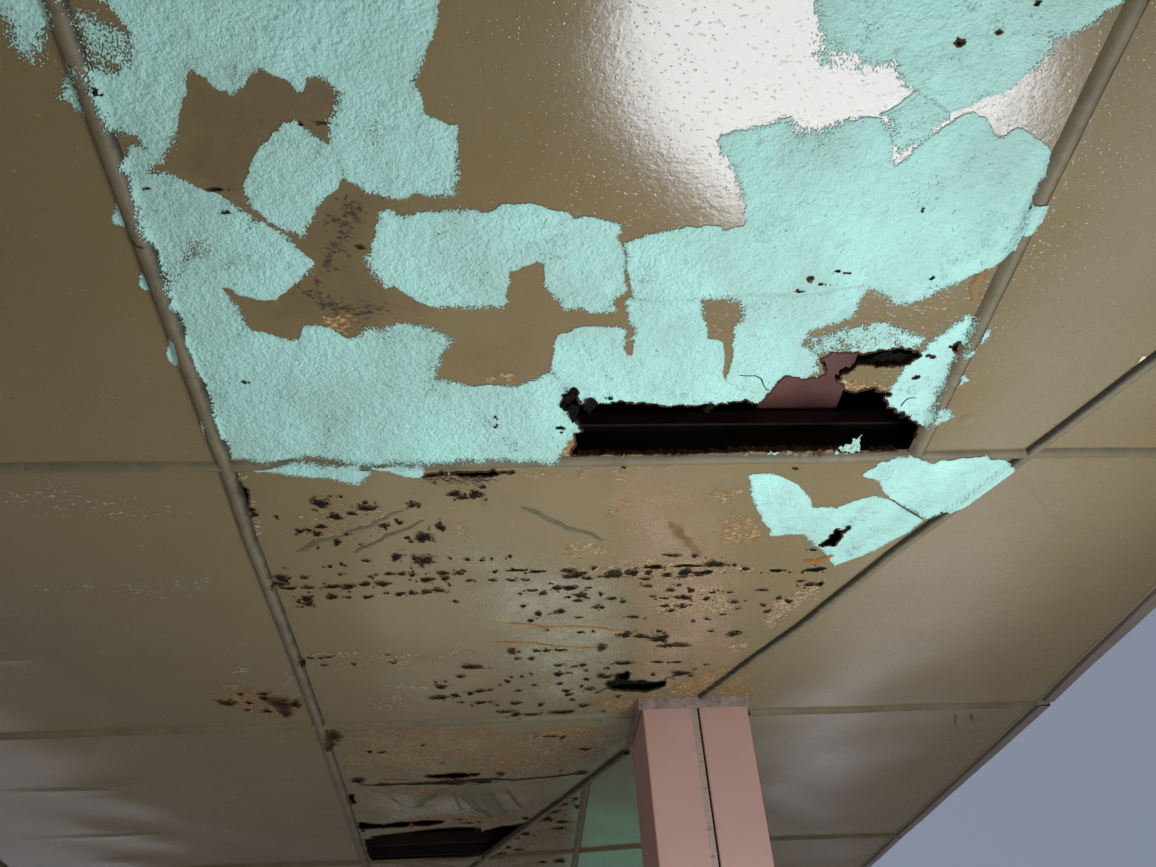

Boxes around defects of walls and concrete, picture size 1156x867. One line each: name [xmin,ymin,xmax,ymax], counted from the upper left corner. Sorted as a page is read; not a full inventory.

peeling [865,351,913,363]
peeling [562,388,613,423]
peeling [767,434,862,457]
leakage [296,469,780,774]
leakage [318,726,578,848]